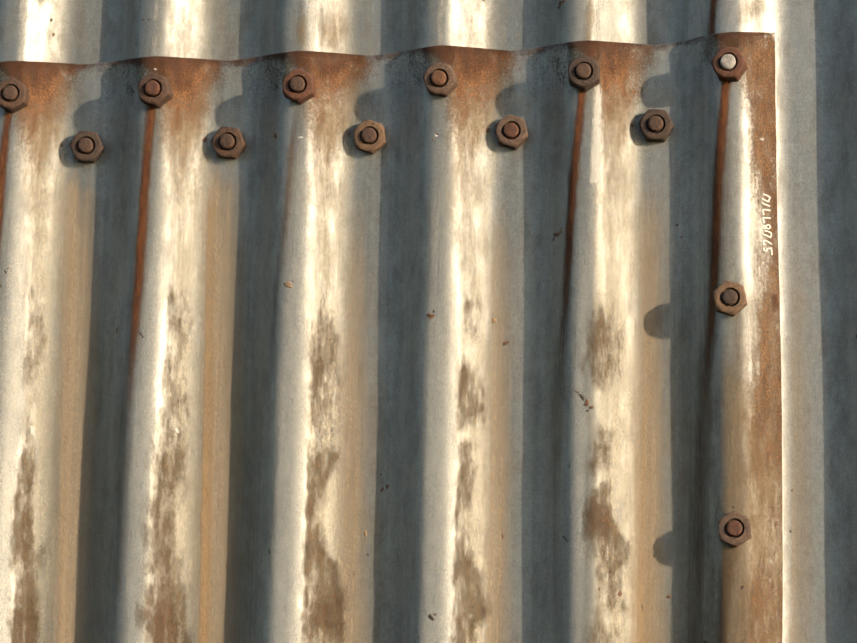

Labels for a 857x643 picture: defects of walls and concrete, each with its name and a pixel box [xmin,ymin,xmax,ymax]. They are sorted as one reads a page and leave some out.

leakage [0,146,58,643]
corrosion [0,61,88,238]
leakage [127,183,166,643]
leakage [167,153,206,643]
corrosion [112,51,389,354]
leakage [271,157,308,643]
leakage [419,197,456,643]
corrosion [410,45,516,159]
corrosion [564,89,586,303]
corrosion [567,40,666,147]
leakage [597,134,639,643]
corrosion [677,0,783,643]